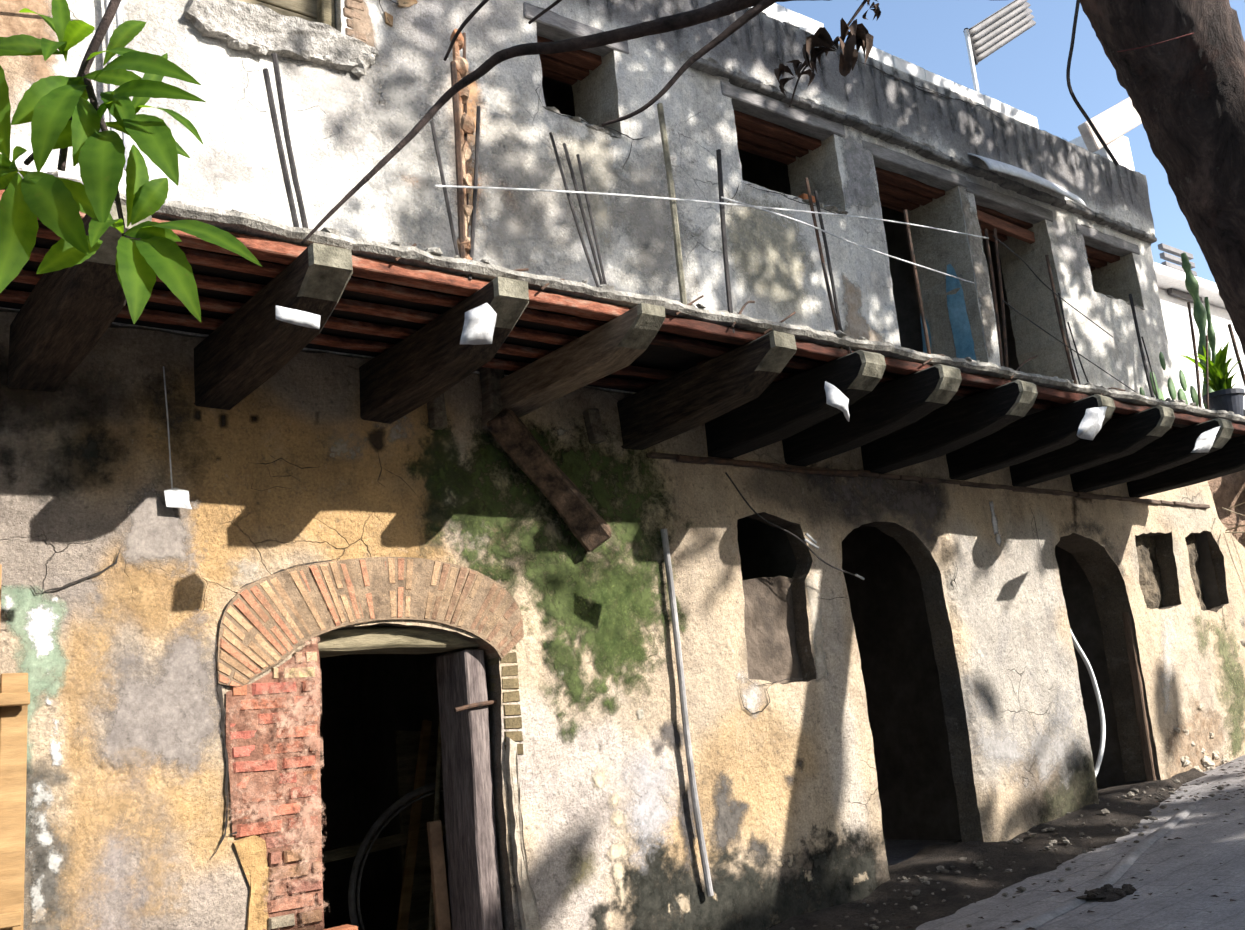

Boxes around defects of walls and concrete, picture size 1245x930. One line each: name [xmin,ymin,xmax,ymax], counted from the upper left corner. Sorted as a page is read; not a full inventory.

spalling [183,0,440,169]
damp [43,409,123,496]
damp [411,424,500,579]
crack [30,545,122,594]
damp [547,654,621,742]
damp [591,721,885,930]
damp [565,851,593,896]